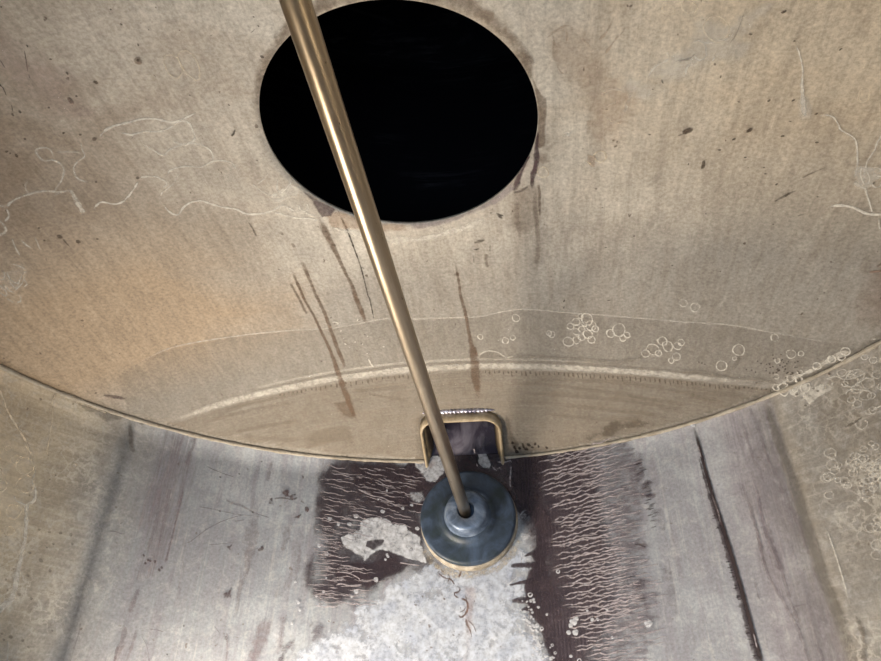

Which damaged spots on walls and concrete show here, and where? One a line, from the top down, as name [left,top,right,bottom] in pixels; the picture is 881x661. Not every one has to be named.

rust [291,269,353,413]
rust [456,273,479,391]
leakage [294,437,667,661]